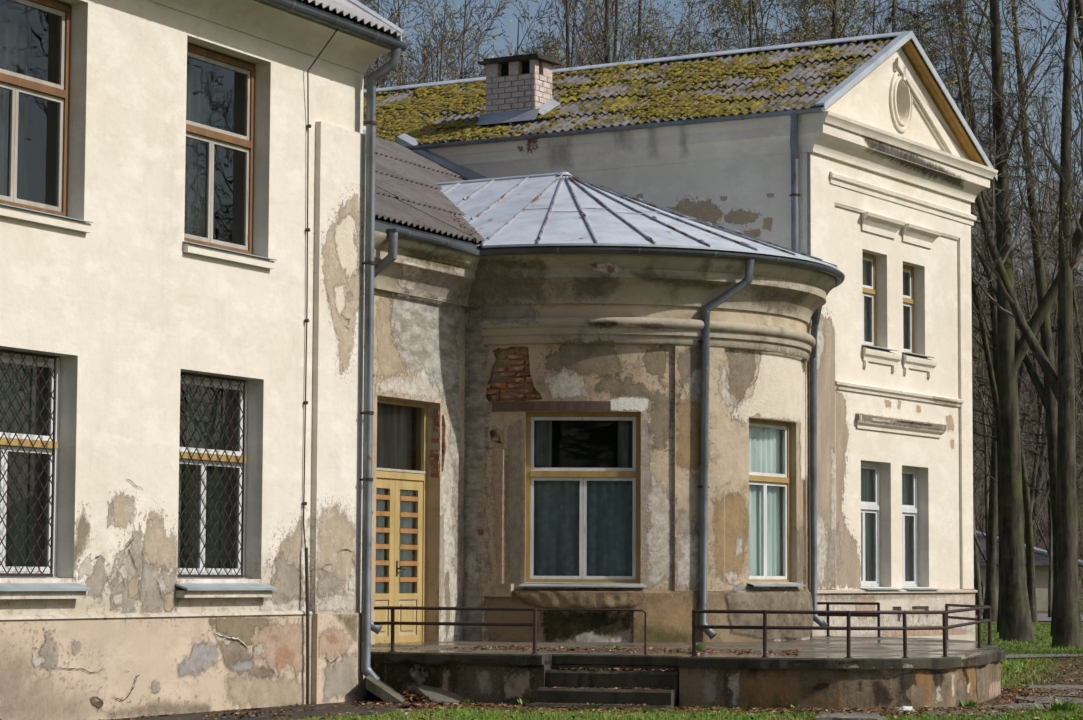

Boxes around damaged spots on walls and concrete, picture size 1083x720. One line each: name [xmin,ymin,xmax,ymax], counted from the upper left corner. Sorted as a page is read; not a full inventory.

peeling [314,189,364,375]
peeling [667,197,773,237]
peeling [32,628,59,670]
peeling [75,492,178,622]
peeling [209,497,361,709]
peeling [375,363,512,642]
flaking render [486,335,712,476]
peeling [642,472,749,594]
peeling [716,308,973,637]